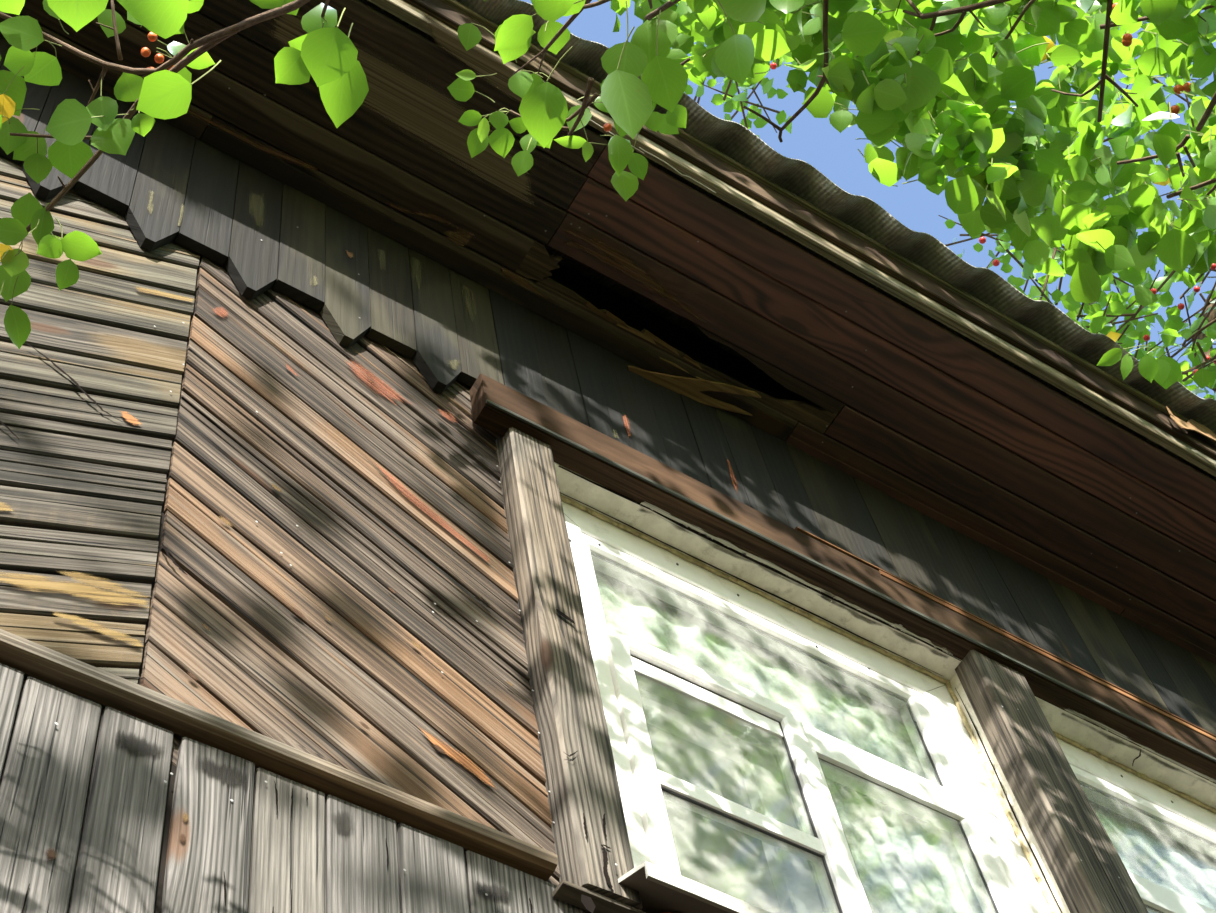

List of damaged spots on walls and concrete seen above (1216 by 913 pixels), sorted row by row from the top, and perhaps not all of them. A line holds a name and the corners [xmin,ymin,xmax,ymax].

peeling [1065,709,1216,783]